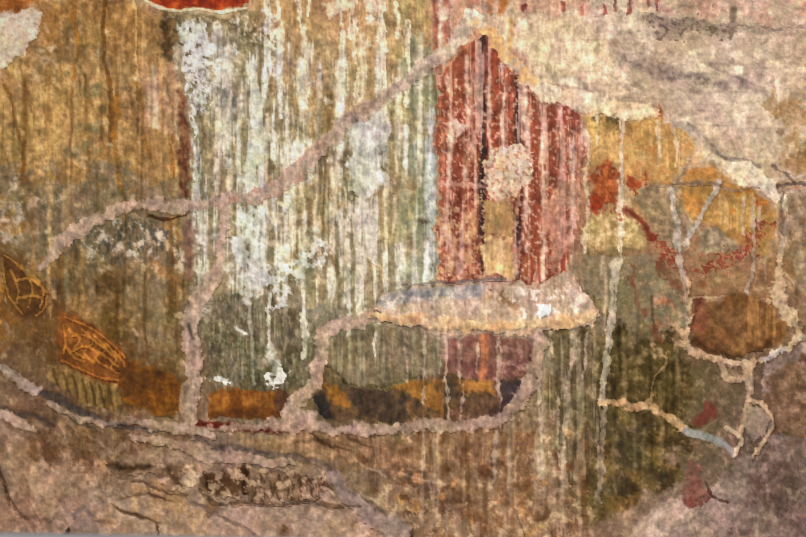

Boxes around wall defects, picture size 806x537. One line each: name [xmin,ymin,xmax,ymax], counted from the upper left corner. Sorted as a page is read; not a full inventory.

peeling [0,6,43,75]
leakage [155,16,224,200]
efflorescence [232,75,269,193]
leakage [263,0,285,97]
crack [0,19,550,537]
efflorescence [232,204,328,390]
leakage [294,0,413,108]
efflorescence [342,287,365,316]
leakage [343,104,392,266]
leakage [425,151,438,282]
crack [597,121,806,459]
spalling [629,290,806,537]